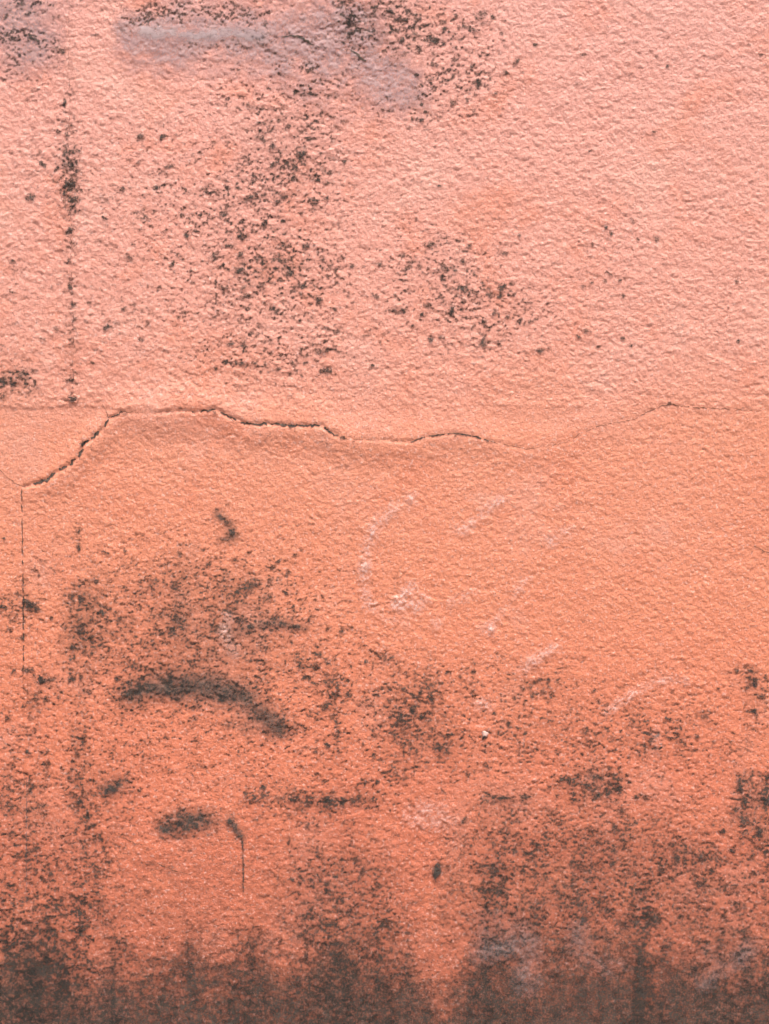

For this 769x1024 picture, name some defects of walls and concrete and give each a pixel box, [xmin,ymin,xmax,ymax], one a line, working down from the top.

crack [0,404,138,688]
water stain [115,0,504,380]
crack [170,402,736,450]
mould [372,237,539,347]
water stain [0,537,769,1024]